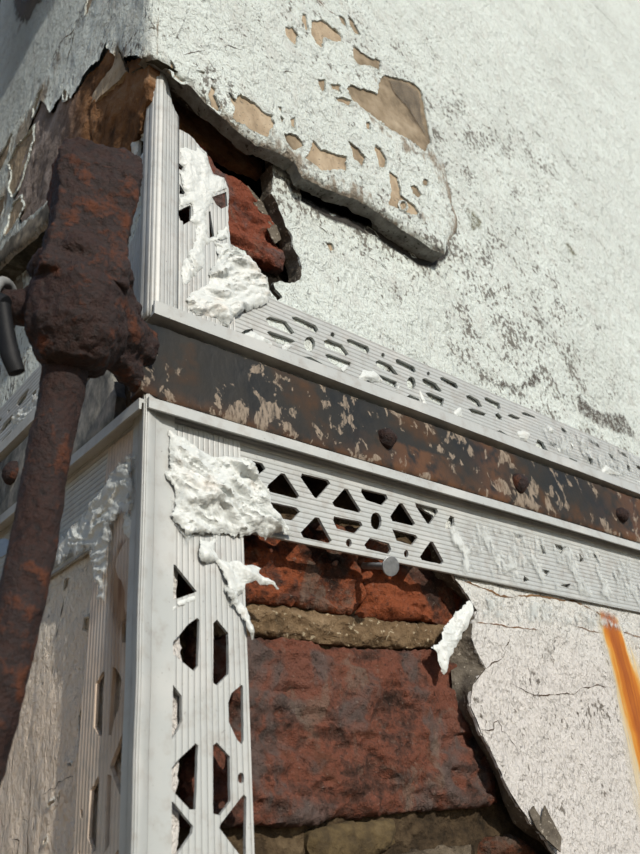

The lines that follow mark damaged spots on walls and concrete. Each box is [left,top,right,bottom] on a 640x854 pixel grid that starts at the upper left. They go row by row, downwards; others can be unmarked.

peeling [283,12,433,153]
spalling [0,49,444,301]
flaking render [426,543,562,854]
crack [477,622,536,668]
crack [465,581,603,634]
crack [513,684,605,705]
rust [600,613,640,797]